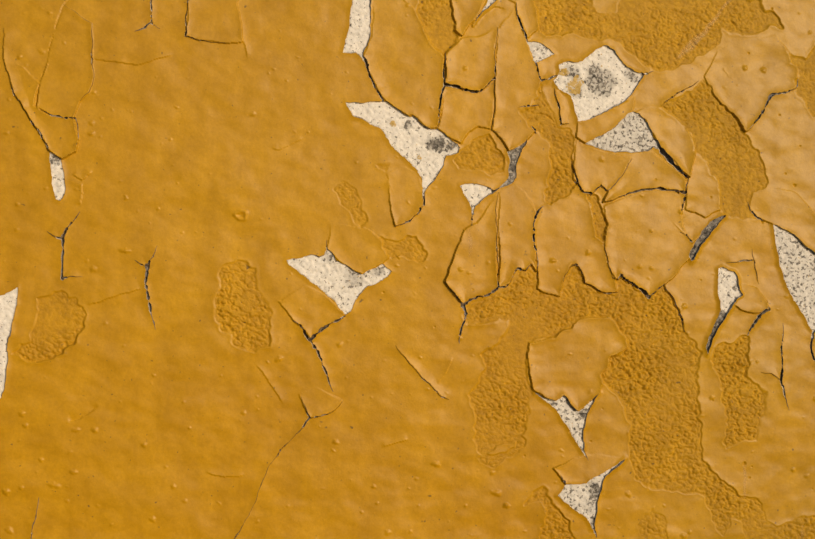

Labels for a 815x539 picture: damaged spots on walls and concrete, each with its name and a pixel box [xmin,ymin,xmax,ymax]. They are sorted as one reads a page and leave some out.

peeling [3,4,94,200]
crack [437,33,498,144]
crack [661,60,798,133]
peeling [0,287,18,398]
peeling [215,261,273,353]
crack [231,302,346,539]
peeling [287,236,427,319]
crack [396,192,543,400]
peeling [343,0,815,539]
crack [601,161,694,298]
crack [727,251,769,336]
crack [762,326,789,408]